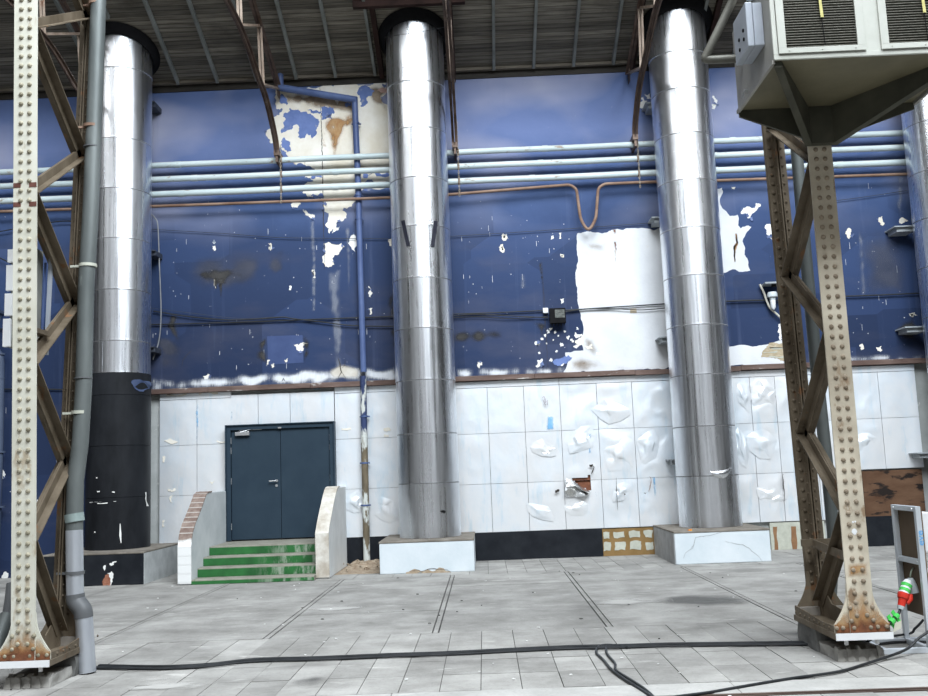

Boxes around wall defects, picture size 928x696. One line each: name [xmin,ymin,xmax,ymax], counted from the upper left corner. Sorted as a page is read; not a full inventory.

rust [326,118,352,147]
peeling [264,83,390,268]
peeling [741,203,761,221]
leakage [332,366,358,377]
rust [835,603,890,633]
rust [0,639,50,661]